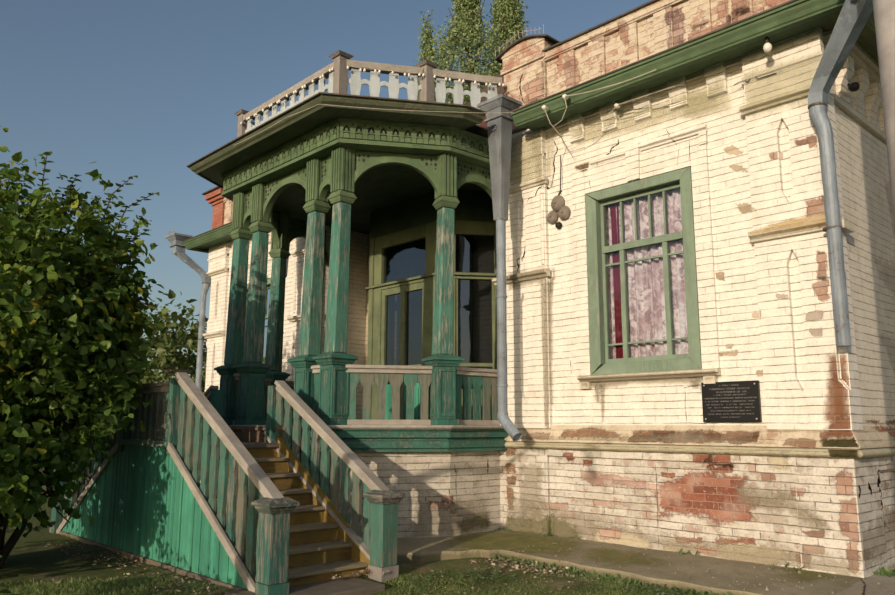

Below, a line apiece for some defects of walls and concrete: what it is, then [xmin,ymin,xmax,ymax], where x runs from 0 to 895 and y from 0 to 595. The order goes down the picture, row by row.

flaking render [664,0,790,48]
crack [527,142,566,202]
flaking render [806,196,825,226]
flaking render [806,251,830,336]
spalling [594,527,650,548]
flaking render [526,428,759,525]
spalling [664,530,825,567]
flaking render [761,425,852,481]
flaking render [835,471,859,573]
crack [858,470,889,528]
flaking render [867,420,895,437]